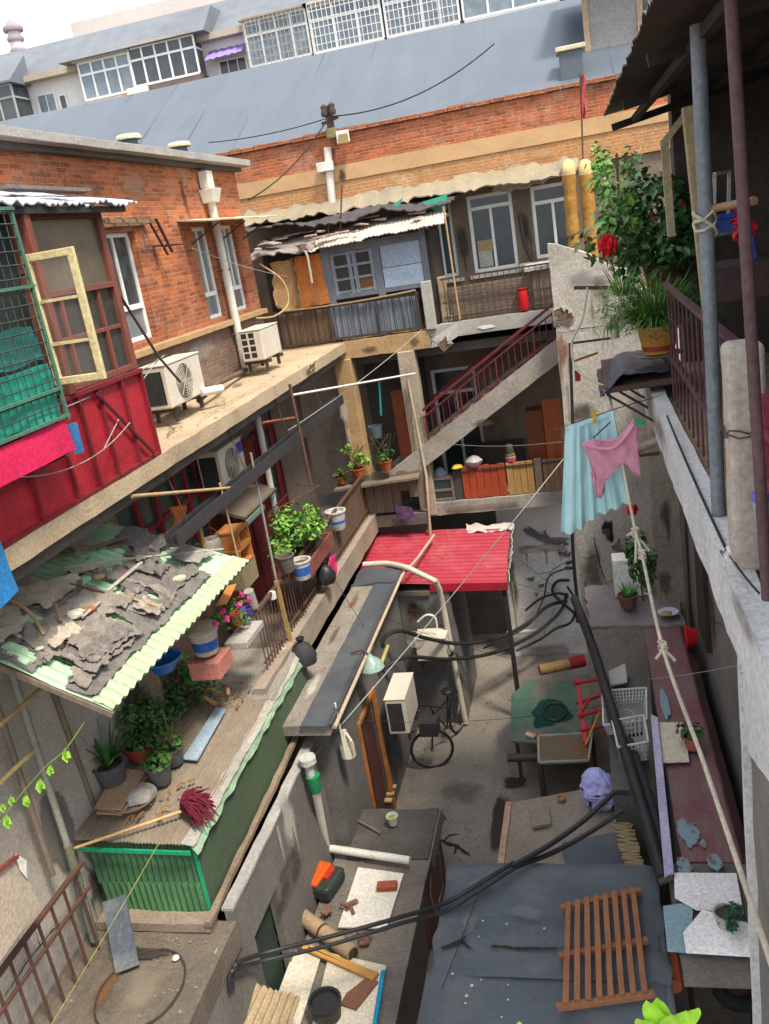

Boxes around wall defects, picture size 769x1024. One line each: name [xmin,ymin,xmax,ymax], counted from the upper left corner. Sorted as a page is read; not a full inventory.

spalling [552,306,576,327]
water stain [277,800,298,890]